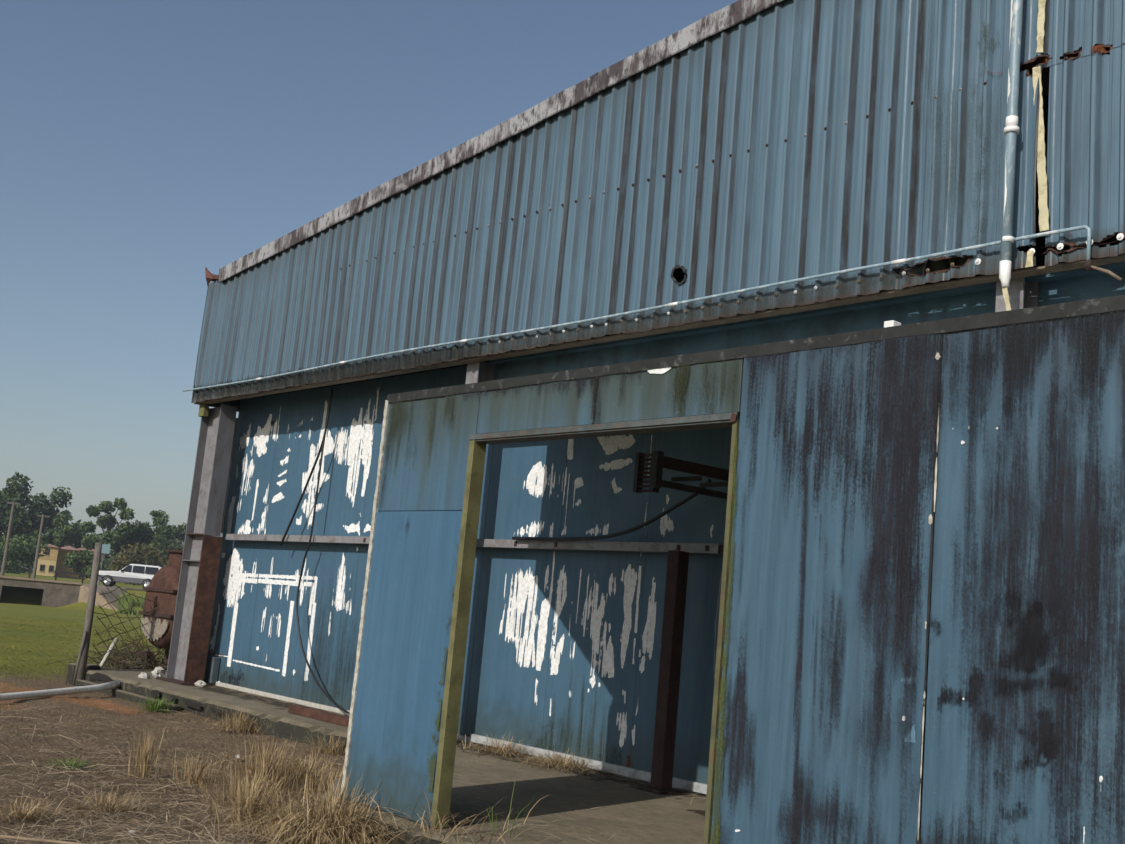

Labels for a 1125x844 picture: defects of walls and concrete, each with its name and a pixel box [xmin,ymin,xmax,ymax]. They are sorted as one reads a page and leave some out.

peeling [208,548,318,681]
peeling [226,389,379,637]
peeling [514,439,584,537]
peeling [499,551,656,716]
peeling [586,523,609,536]
peeling [597,435,635,493]
peeling [660,495,674,537]
water stain [672,310,1125,844]
peeling [616,690,638,748]